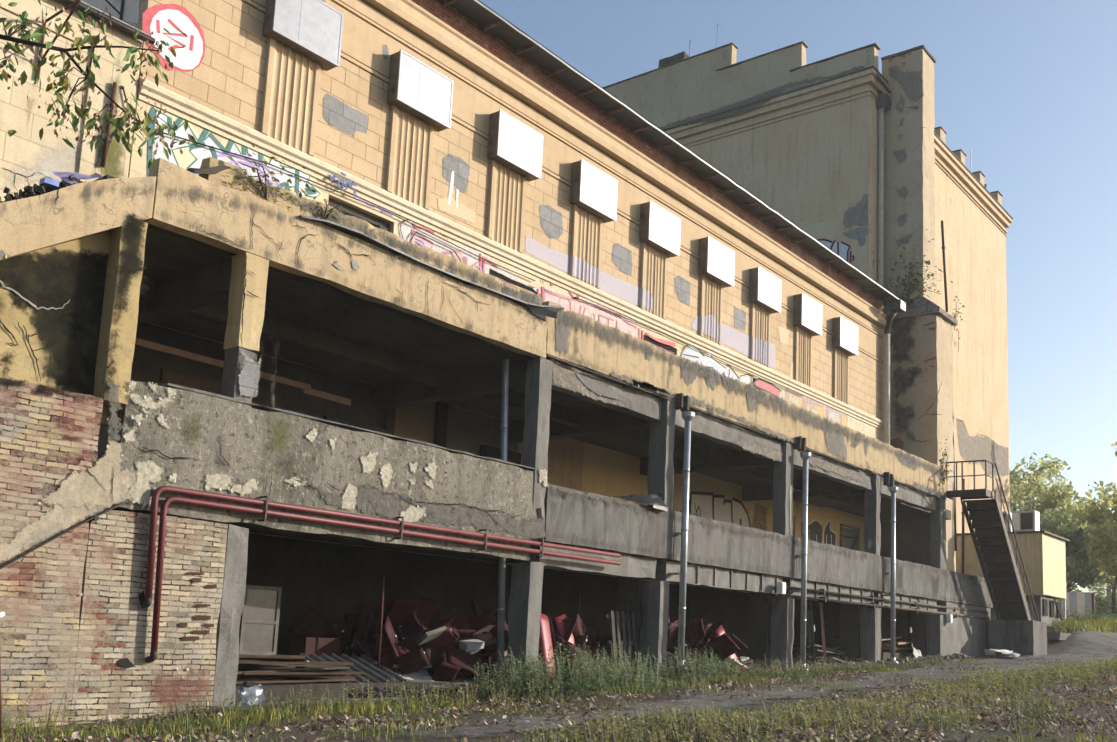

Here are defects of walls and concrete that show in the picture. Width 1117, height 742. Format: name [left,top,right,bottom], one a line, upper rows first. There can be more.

flaking render [888,53,924,163]
water stain [170,189,213,201]
flaking render [843,195,868,229]
crack [0,280,70,381]
water stain [0,214,149,415]
water stain [563,312,944,478]
peeling [306,428,336,450]
flaking render [956,420,1009,476]
peeling [205,473,258,496]
flaking render [153,668,209,707]